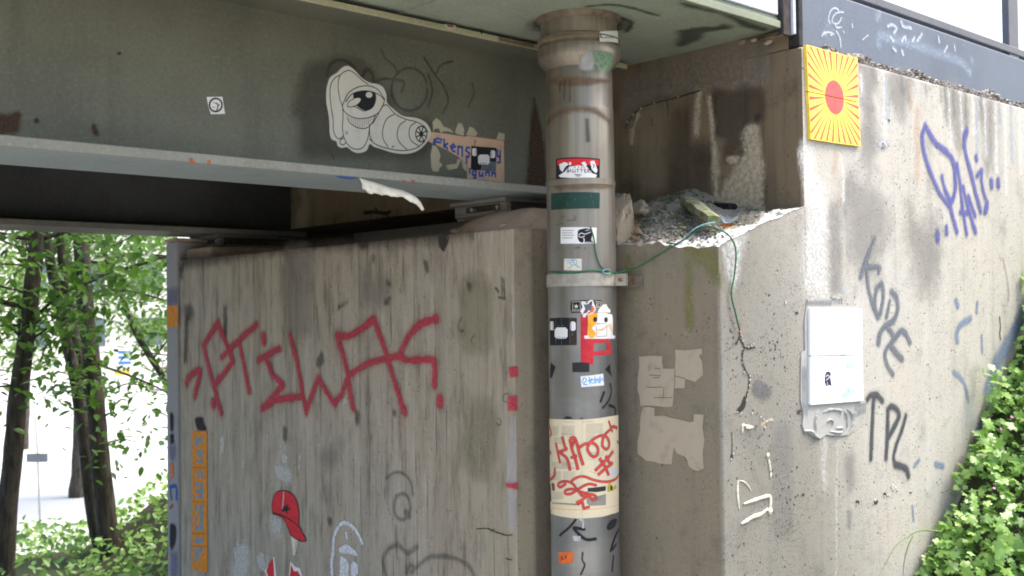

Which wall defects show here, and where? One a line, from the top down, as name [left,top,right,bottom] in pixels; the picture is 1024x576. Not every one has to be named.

rust [0,112,22,135]
spalling [615,193,649,246]
peeling [670,125,795,247]
crack [731,331,755,460]